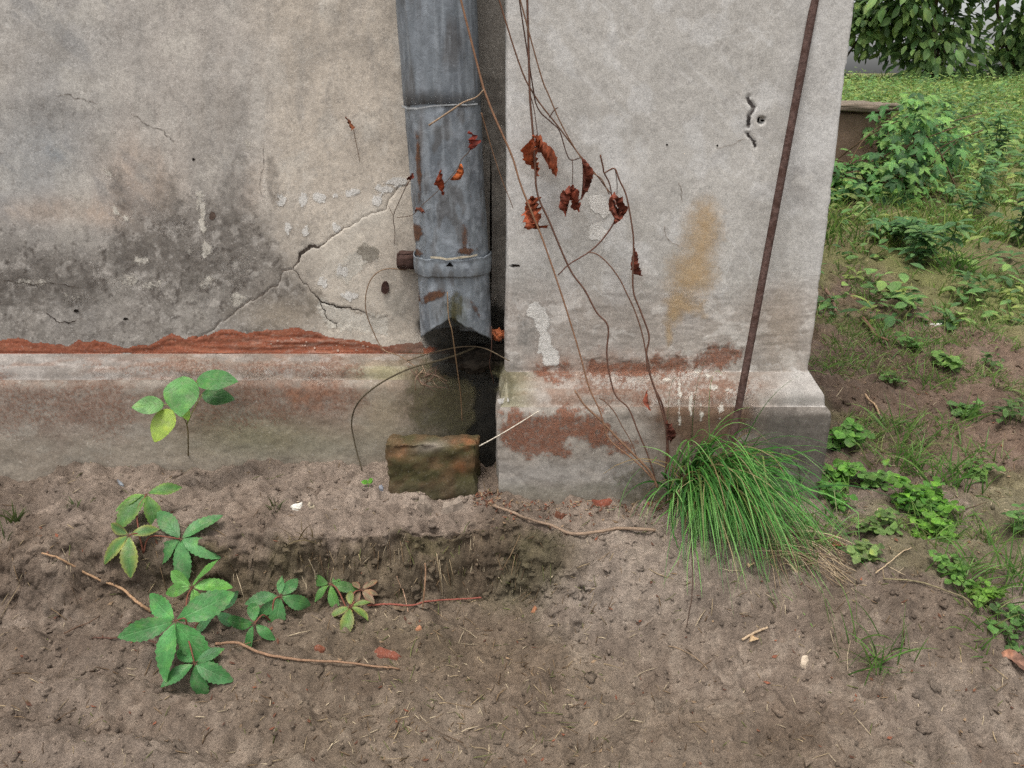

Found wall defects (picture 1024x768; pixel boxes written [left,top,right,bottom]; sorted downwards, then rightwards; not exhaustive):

crack [202,186,400,335]